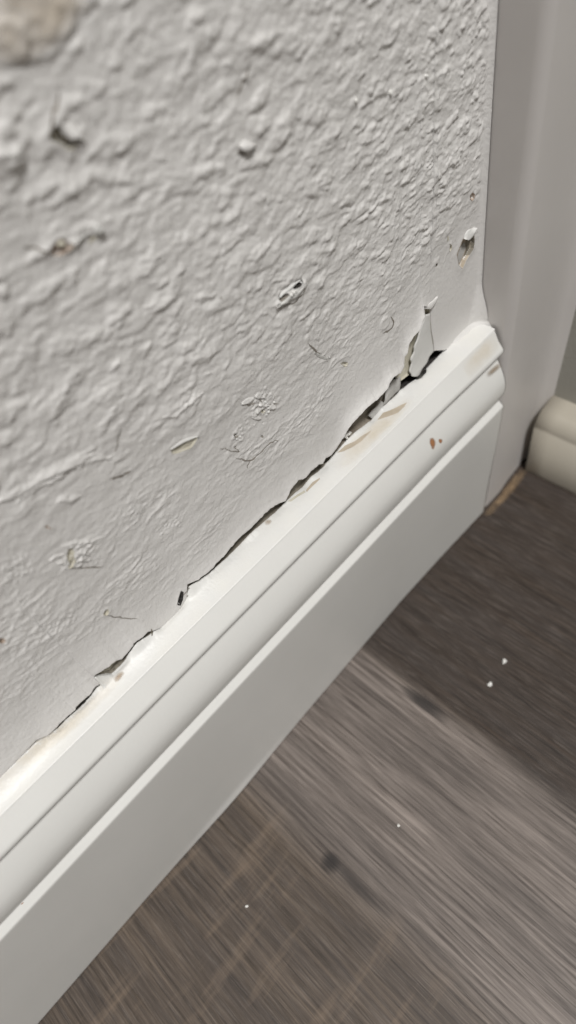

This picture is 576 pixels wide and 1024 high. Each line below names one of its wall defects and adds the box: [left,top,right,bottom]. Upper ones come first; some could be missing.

spalling [463,227,477,256]
peeling [276,279,308,309]
spalling [241,392,278,438]
peeling [378,403,406,419]
crack [110,430,131,480]
peeling [170,436,199,454]
crack [178,296,441,606]
crack [91,615,154,694]